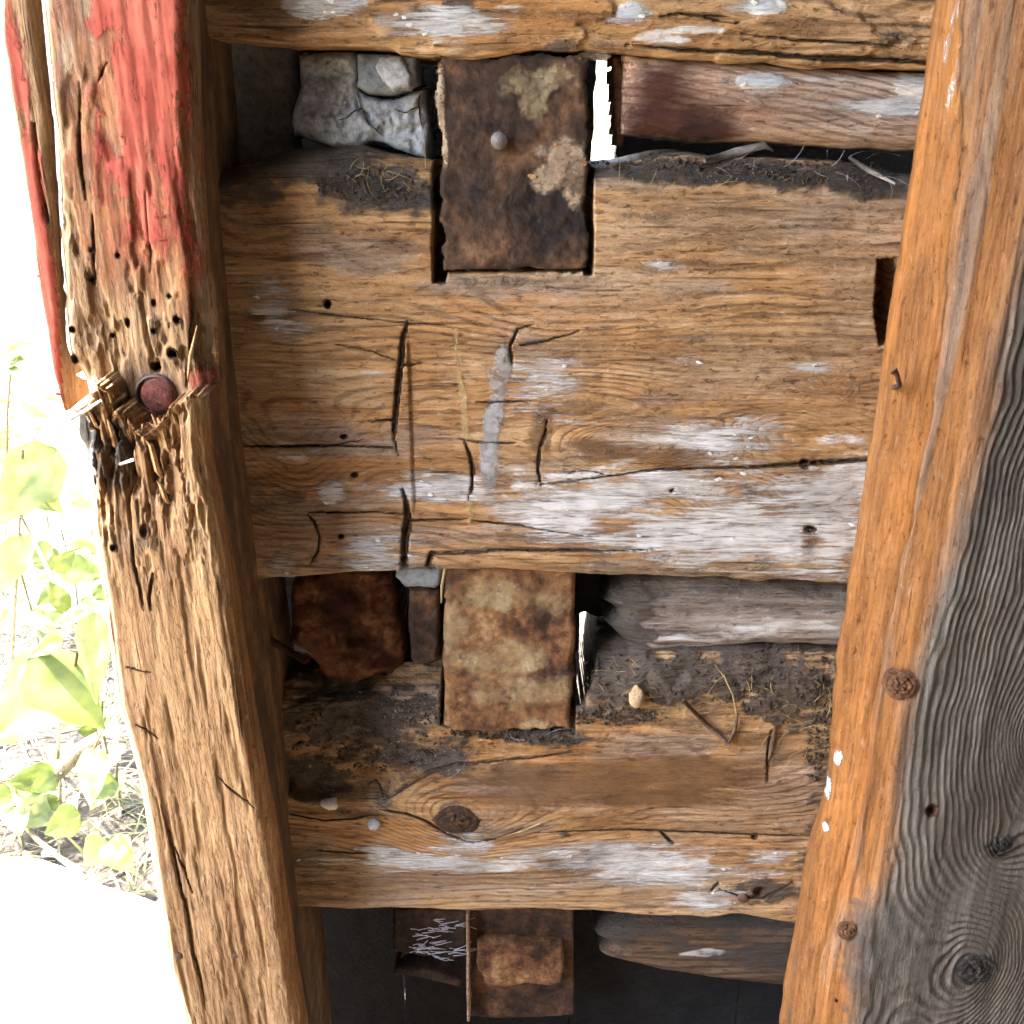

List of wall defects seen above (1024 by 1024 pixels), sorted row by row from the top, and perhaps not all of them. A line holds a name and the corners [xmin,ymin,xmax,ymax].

peeling [84,0,204,280]
peeling [2,0,98,471]
crack [244,308,446,456]
crack [478,398,527,406]
crack [509,323,579,363]
crack [308,423,867,566]